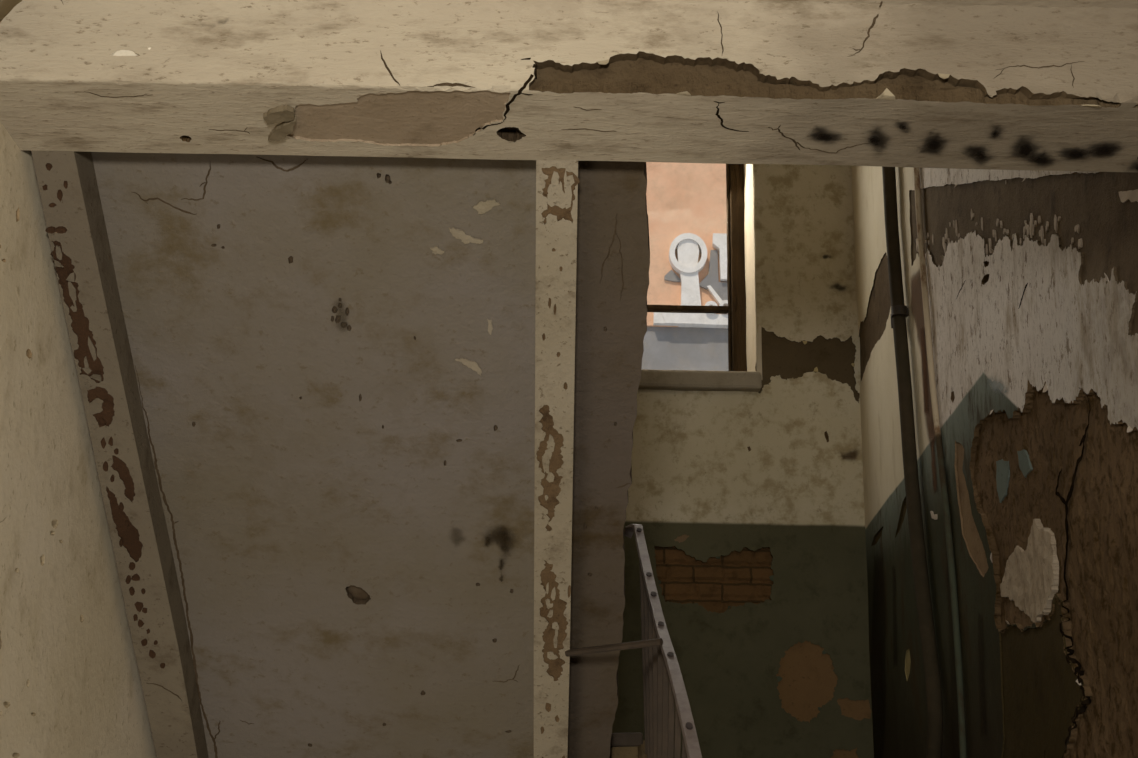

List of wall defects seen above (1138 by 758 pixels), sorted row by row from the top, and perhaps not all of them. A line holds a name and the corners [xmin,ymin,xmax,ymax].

peeling [263,90,511,146]
crack [473,58,537,136]
flaking render [529,51,1138,108]
peeling [541,166,580,224]
flaking render [909,172,1138,336]
flaking render [755,252,891,403]
peeling [45,226,165,669]
peeling [536,405,564,531]
peeling [540,560,571,681]
flaking render [654,534,774,613]
flaking render [954,381,1138,758]
peeling [776,641,872,723]